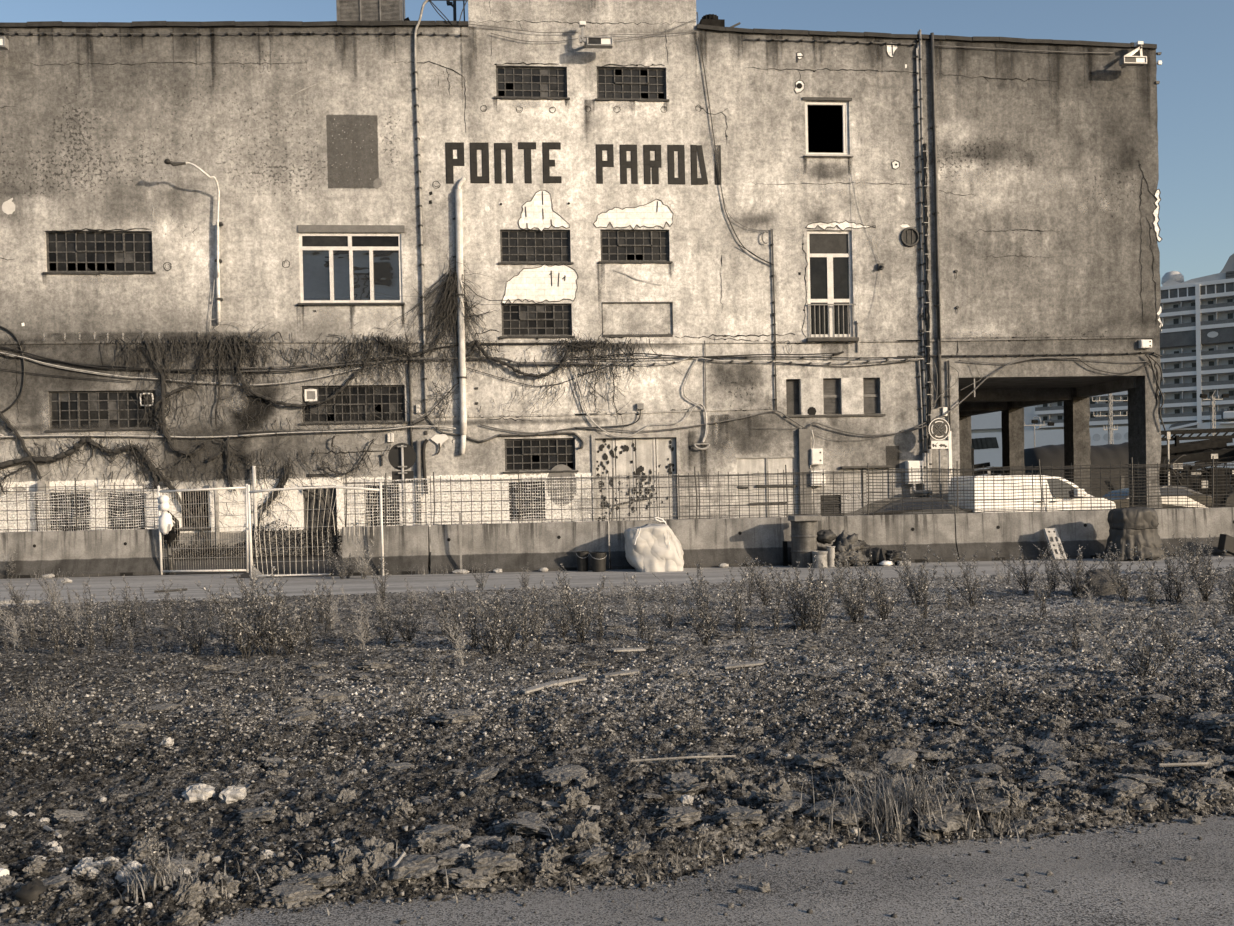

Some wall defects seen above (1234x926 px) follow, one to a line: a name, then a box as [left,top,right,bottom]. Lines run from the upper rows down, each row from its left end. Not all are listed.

spalling [518,190,571,232]
spalling [593,199,674,230]
spalling [805,220,876,231]
spalling [501,264,578,304]